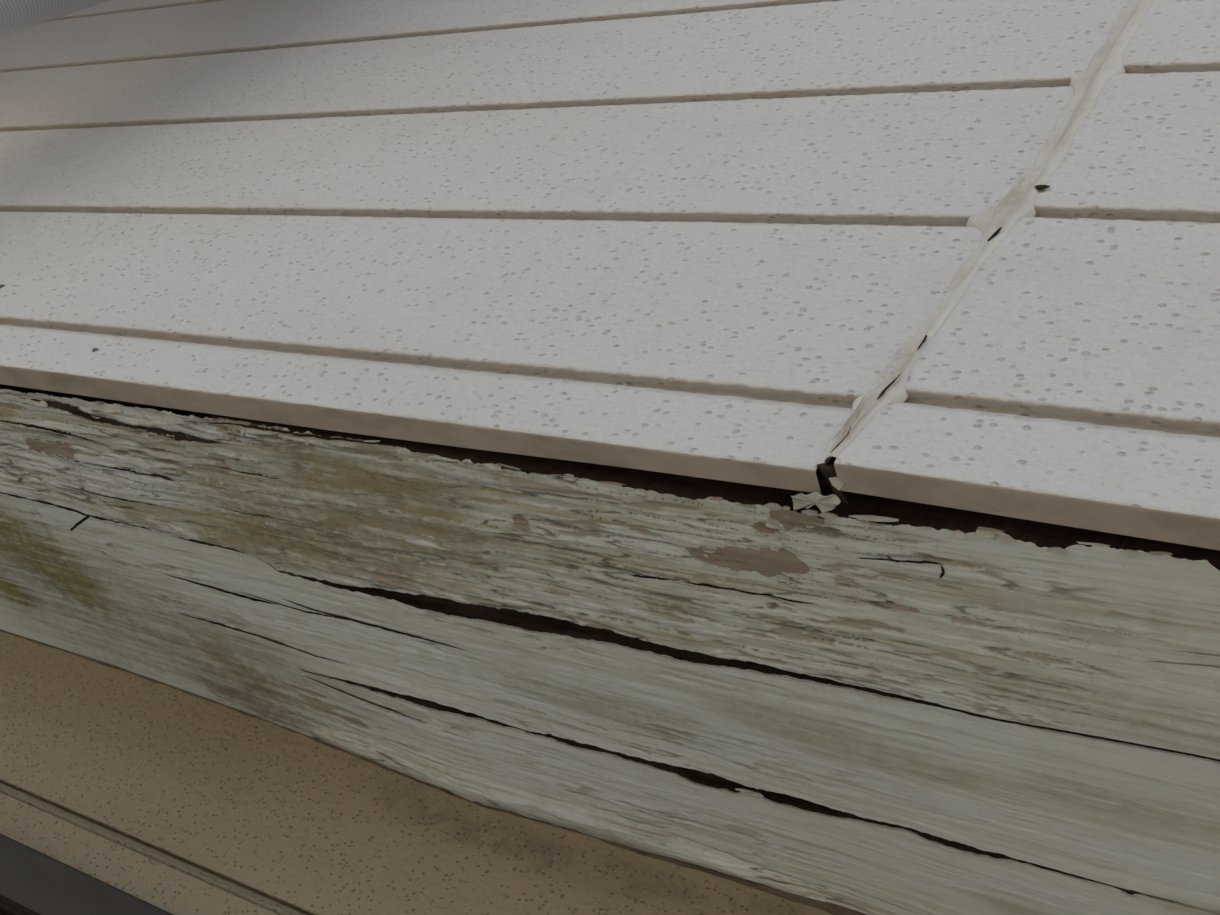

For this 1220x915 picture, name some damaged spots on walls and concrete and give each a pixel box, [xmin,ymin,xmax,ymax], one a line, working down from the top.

crack [987,227,1002,241]
crack [877,374,901,400]
peeling [23,437,76,462]
peeling [676,503,835,580]
peeling [954,529,1012,543]
peeling [1047,547,1067,555]
peeling [1121,549,1141,557]
crack [0,396,1220,764]
crack [173,611,1220,915]